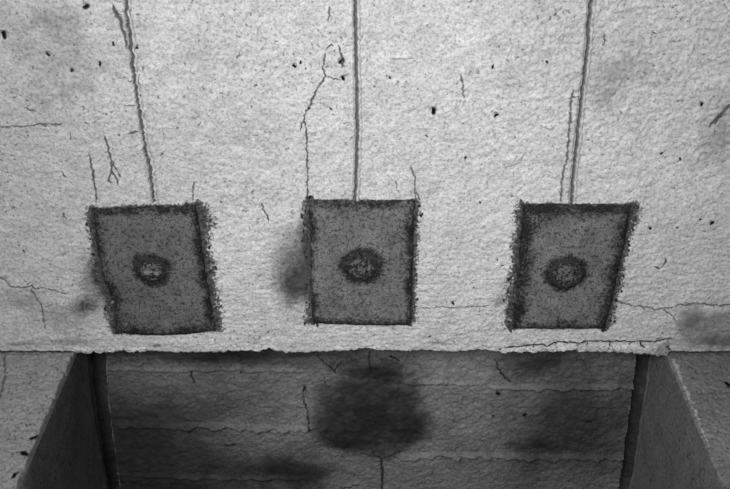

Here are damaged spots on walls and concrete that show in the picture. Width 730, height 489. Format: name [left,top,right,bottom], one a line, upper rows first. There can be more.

crack [112,0,158,203]
crack [300,0,363,201]
crack [560,0,606,204]
crack [494,301,730,382]